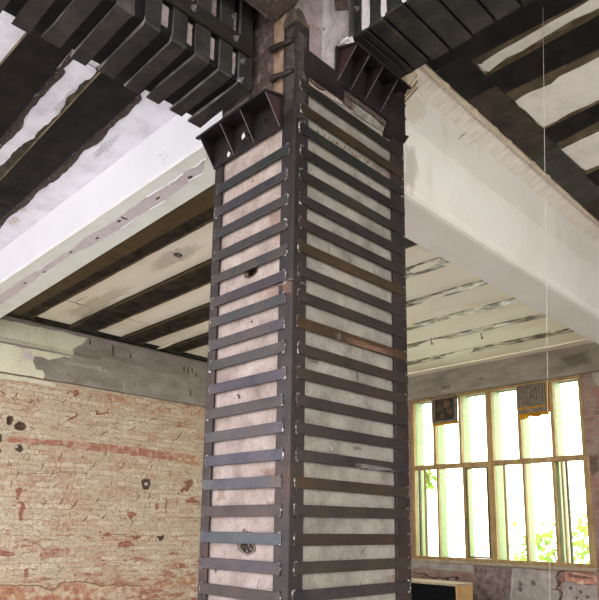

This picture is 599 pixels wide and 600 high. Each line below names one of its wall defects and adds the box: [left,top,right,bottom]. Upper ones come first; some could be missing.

flaking render [0,94,142,229]
peeling [0,158,207,305]
flaking render [82,306,112,326]
peeling [0,319,88,387]
flaking render [408,338,593,377]
spalling [7,415,27,431]
spalling [13,487,27,521]
spalling [177,479,200,503]
spalling [0,542,24,557]
spalling [118,535,141,552]
flaking render [0,566,196,600]